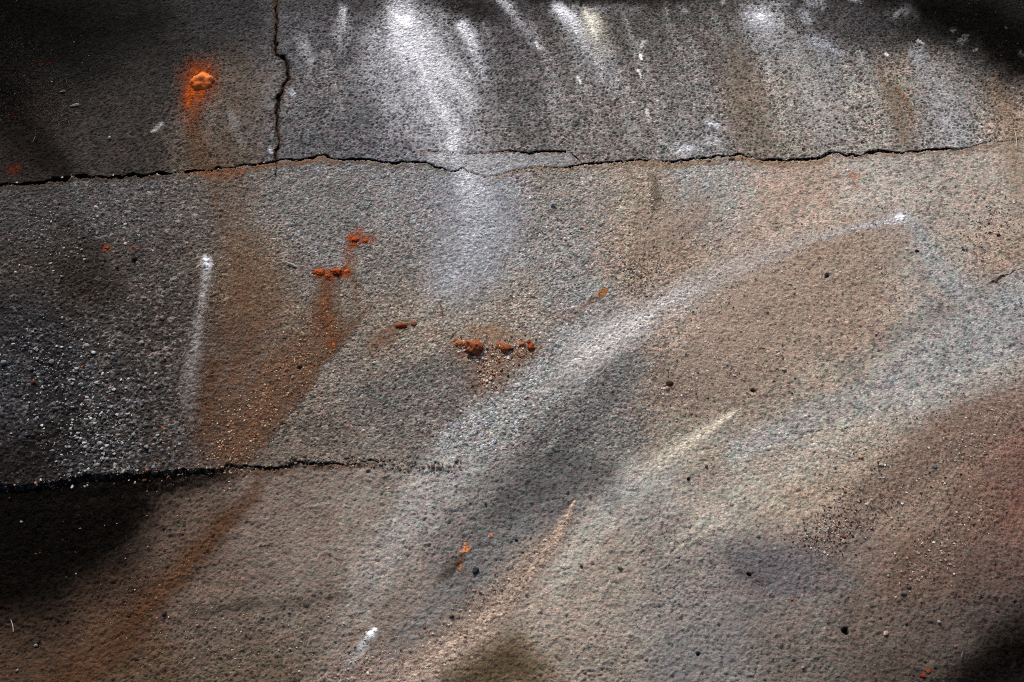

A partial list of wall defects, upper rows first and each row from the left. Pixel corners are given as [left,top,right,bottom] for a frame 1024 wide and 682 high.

rust [183,63,216,112]
crack [0,0,1019,188]
crack [1,459,393,494]